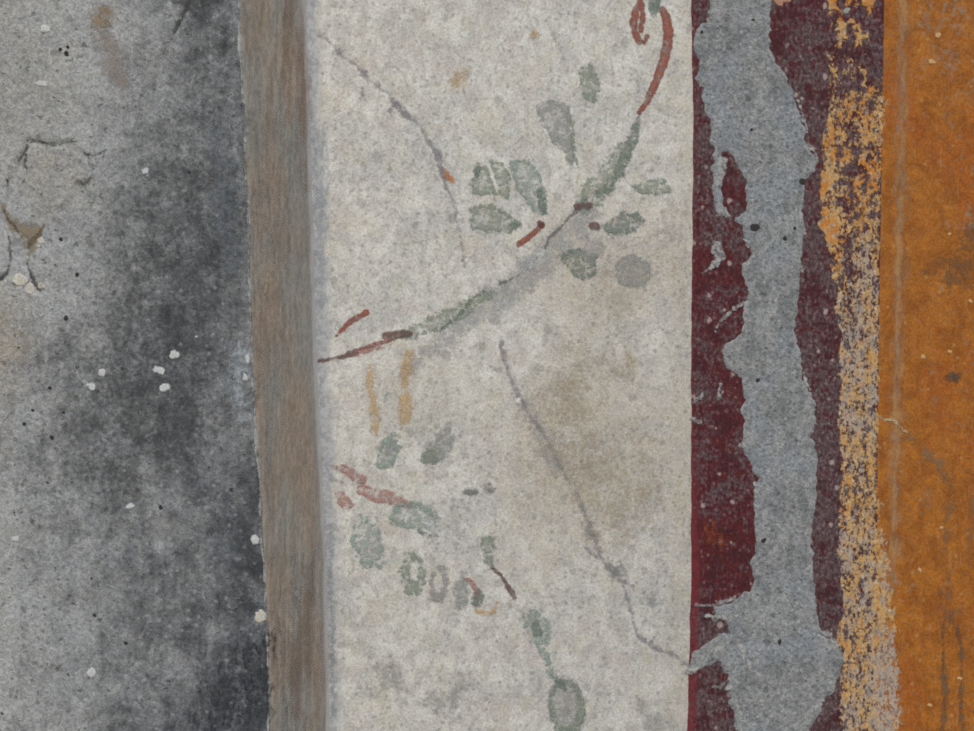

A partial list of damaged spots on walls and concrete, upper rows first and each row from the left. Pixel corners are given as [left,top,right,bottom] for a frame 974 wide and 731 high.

crack [158,0,191,64]
crack [6,139,106,182]
crack [335,48,447,189]
crack [0,235,41,291]
efflorescence [229,341,253,422]
crack [499,340,543,433]
spalling [685,0,904,731]
crack [554,456,685,664]
leakage [188,632,276,731]